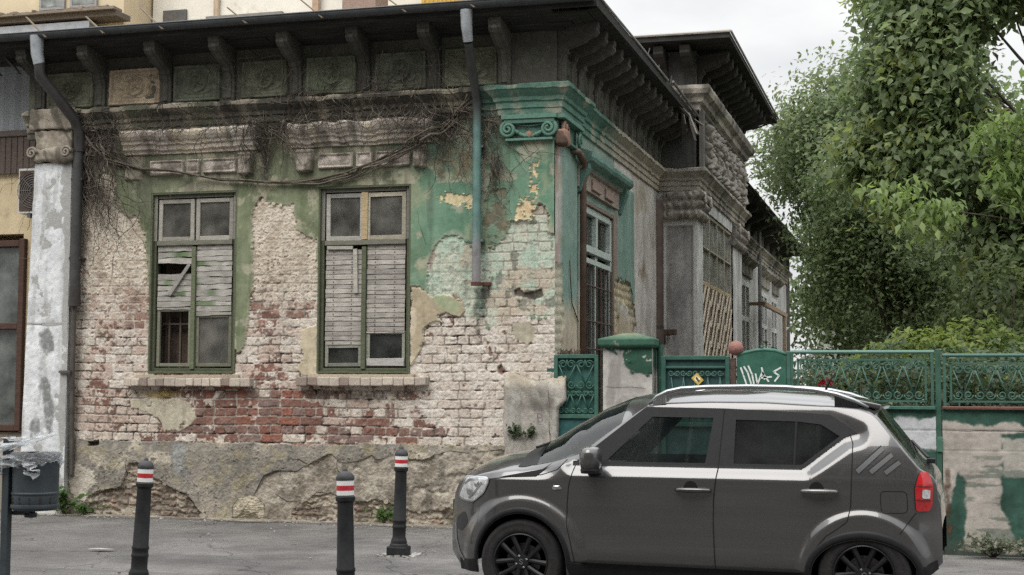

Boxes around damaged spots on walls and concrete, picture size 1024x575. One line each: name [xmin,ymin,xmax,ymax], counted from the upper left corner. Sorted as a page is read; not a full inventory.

peeling [76,171,149,347]
peeling [237,200,318,361]
peeling [426,147,565,355]
spalling [68,462,138,516]
spalling [150,478,207,518]
spalling [163,374,505,526]
crack [232,451,468,516]
peeling [603,348,661,411]